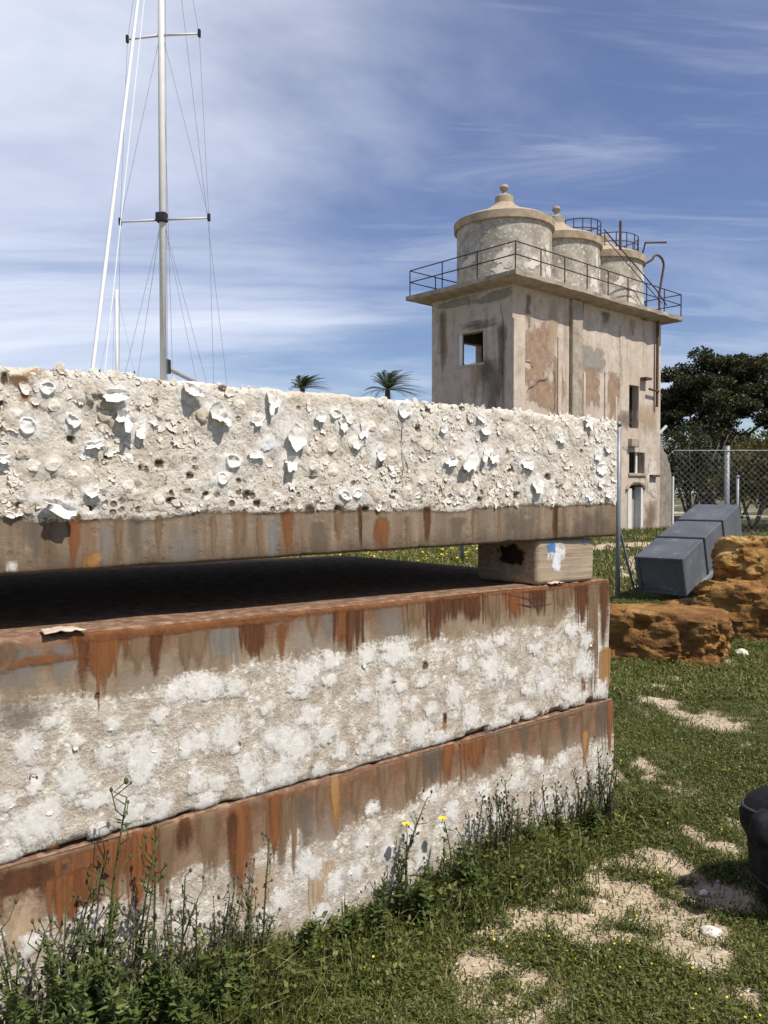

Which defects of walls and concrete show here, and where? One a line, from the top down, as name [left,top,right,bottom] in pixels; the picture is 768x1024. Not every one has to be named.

peeling [0,373,171,522]
peeling [155,449,194,479]
peeling [173,315,635,512]
corrosion [66,516,102,569]
corrosion [233,510,263,553]
corrosion [281,509,293,551]
corrosion [374,518,389,549]
corrosion [0,580,613,766]
corrosion [330,713,486,830]
corrosion [0,817,191,937]
corrosion [223,801,255,895]
corrosion [266,794,297,872]